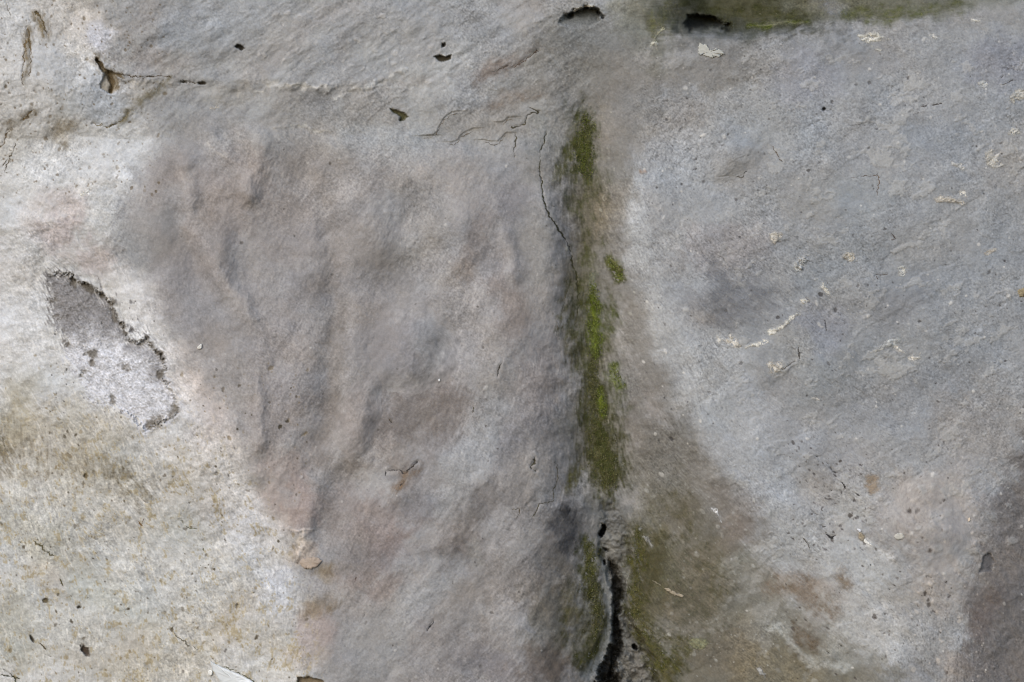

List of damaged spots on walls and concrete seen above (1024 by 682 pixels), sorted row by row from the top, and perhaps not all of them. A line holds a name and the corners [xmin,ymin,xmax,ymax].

crack [511,107,580,340]
spalling [47,273,180,431]
crack [597,524,638,682]